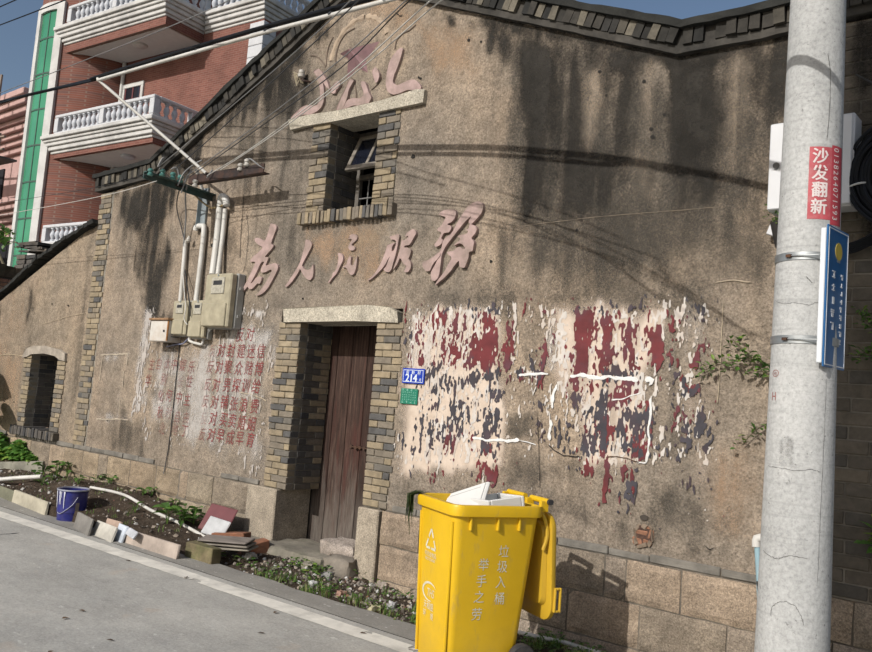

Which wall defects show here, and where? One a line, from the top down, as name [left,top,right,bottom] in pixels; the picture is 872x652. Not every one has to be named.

damp [115,45,314,348]
damp [481,16,788,299]
peeling [131,300,279,476]
peeling [393,294,721,549]